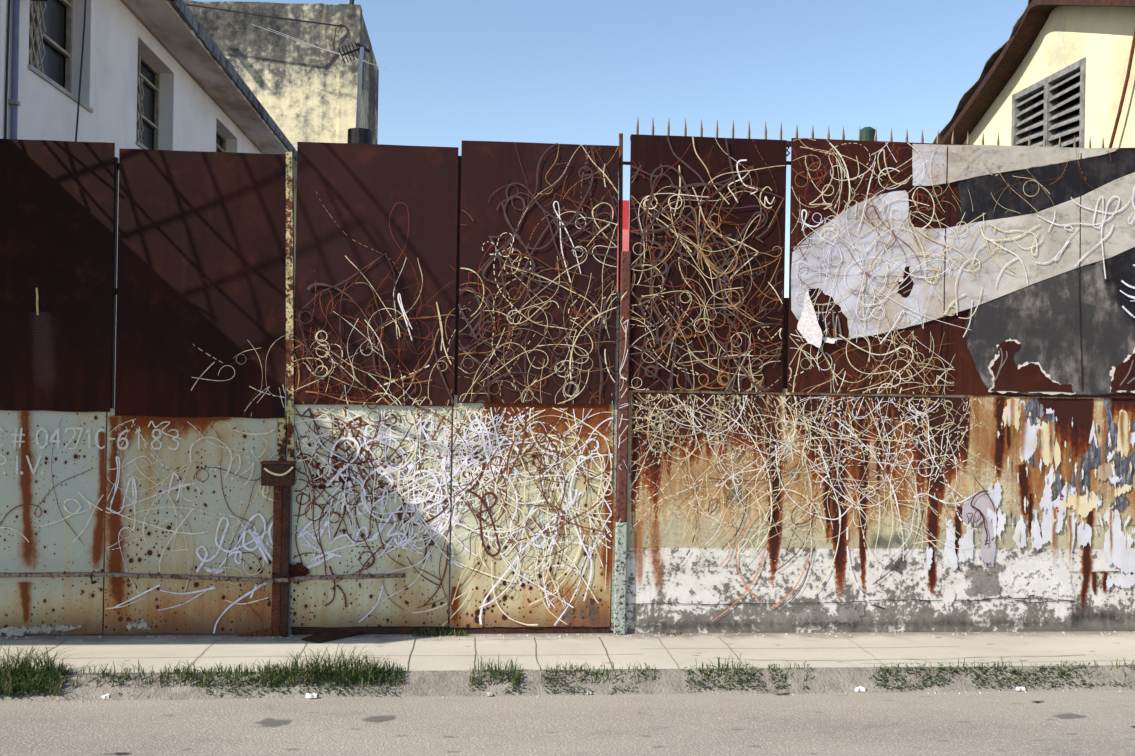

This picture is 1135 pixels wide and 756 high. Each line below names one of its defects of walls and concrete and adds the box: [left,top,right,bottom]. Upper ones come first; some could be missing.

peeling [990,341,1074,393]
peeling [1111,353,1135,392]
corrosion [18,411,36,566]
corrosion [306,476,351,491]
corrosion [483,403,616,582]
corrosion [631,392,1135,613]
corrosion [289,562,310,582]
corrosion [19,582,30,623]
corrosion [450,587,459,624]